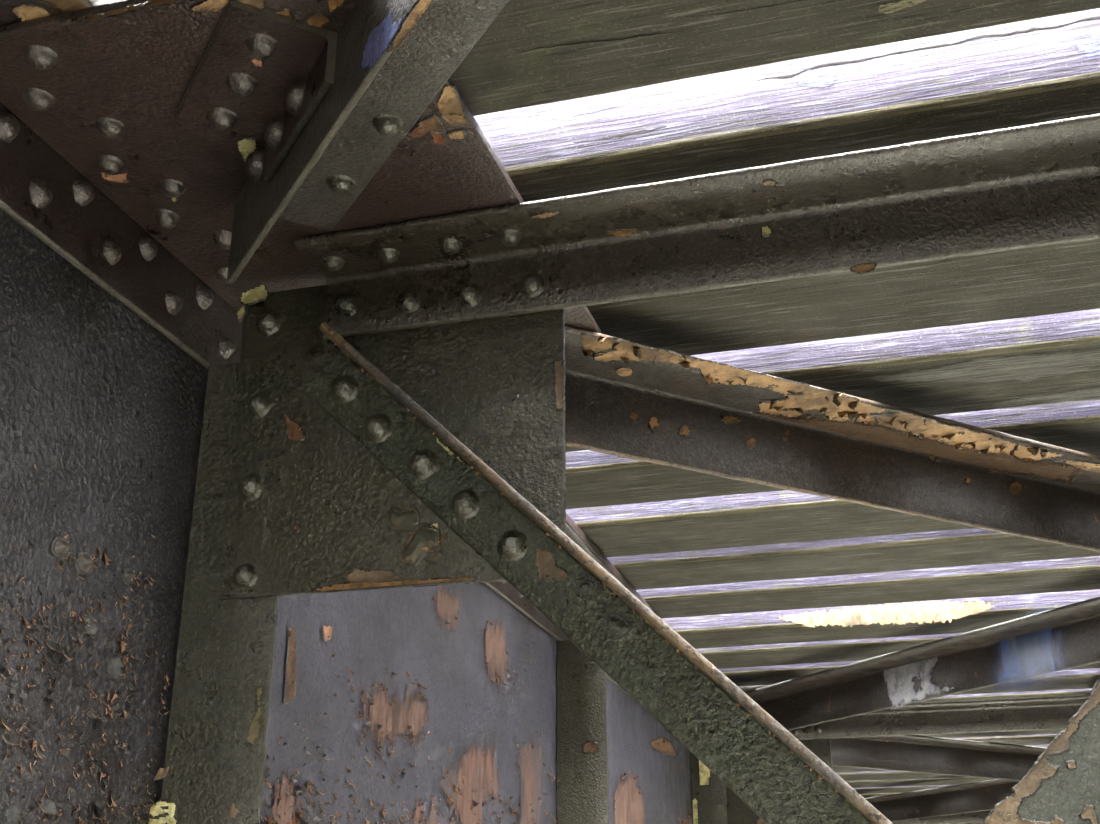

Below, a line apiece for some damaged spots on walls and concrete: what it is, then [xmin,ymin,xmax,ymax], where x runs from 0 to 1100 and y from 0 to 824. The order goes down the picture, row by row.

peeling [418,84,469,139]
peeling [581,334,1100,473]
peeling [283,625,297,705]
peeling [322,625,332,642]
peeling [480,619,529,700]
peeling [261,659,560,824]
peeling [983,682,1100,824]